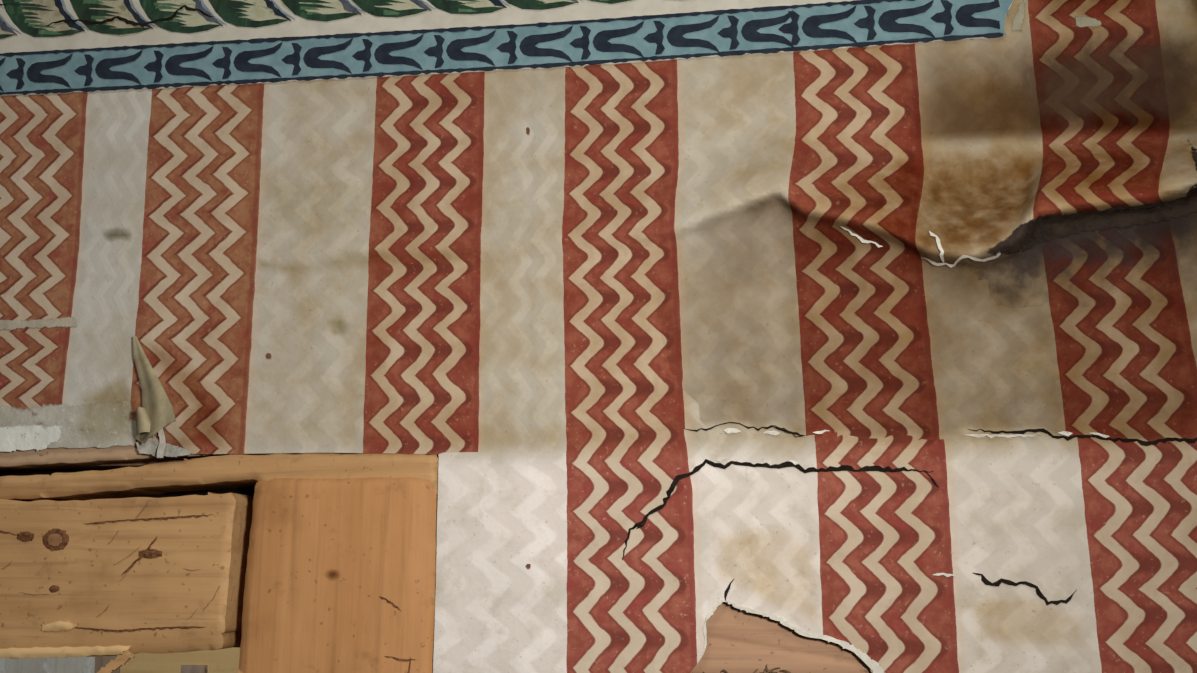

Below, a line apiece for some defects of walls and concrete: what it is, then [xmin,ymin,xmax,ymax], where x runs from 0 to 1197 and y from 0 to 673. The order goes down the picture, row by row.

leakage [939,48,1197,133]
leakage [960,200,1197,283]
peeling [0,400,137,452]
crack [964,428,1197,446]
crack [622,422,938,560]
crack [933,572,1076,605]